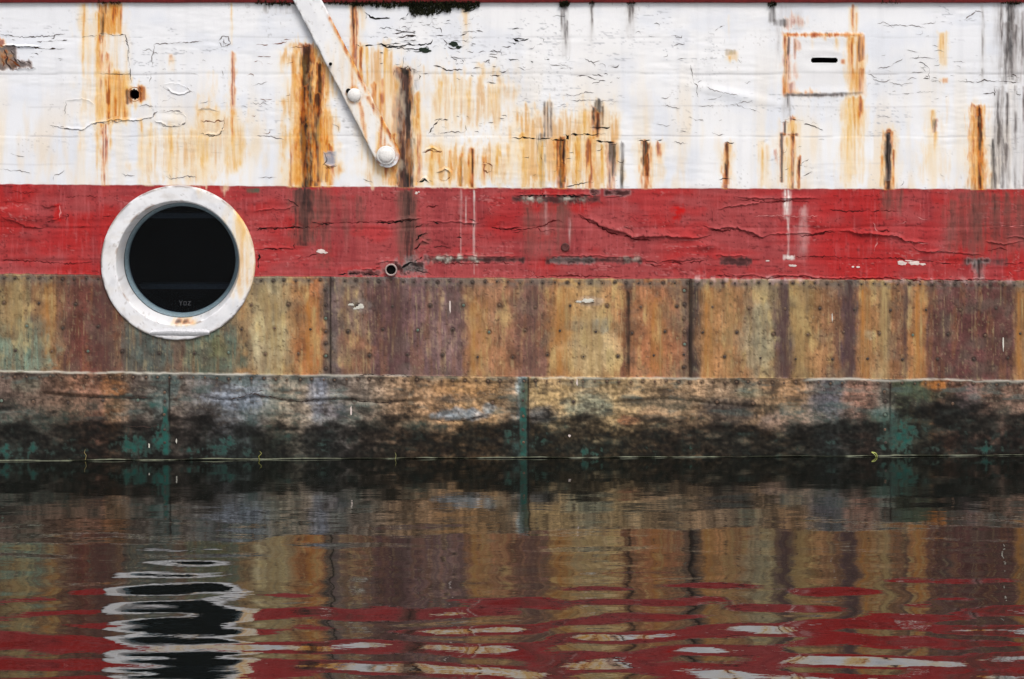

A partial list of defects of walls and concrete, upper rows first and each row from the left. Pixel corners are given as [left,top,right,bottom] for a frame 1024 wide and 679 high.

peeling [0,35,41,74]
peeling [50,82,228,137]
crack [358,8,619,107]
crack [428,23,760,187]
rust [755,3,990,191]
rust [68,3,675,377]
rust [712,135,740,190]
crack [772,119,957,264]
crack [4,258,98,266]
leakage [0,277,1024,461]
rust [693,285,743,380]
rust [852,282,931,379]